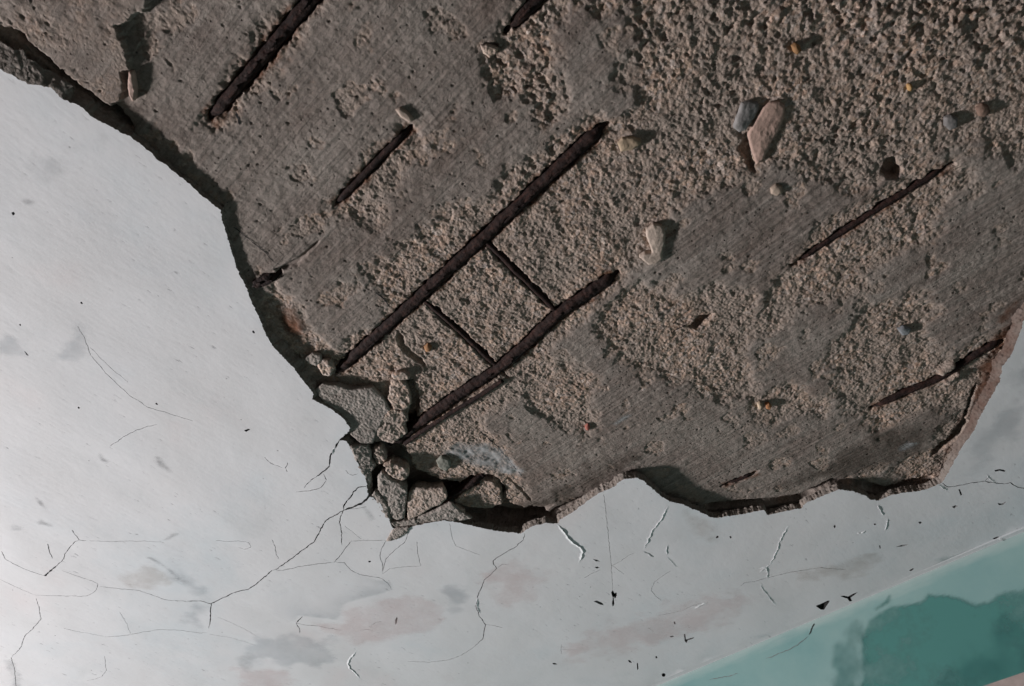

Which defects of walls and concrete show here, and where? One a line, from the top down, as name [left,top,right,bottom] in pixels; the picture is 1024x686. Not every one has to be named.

spalling [0,0,1024,534]
crack [78,327,189,443]
rust [974,310,1011,398]
crack [943,478,1024,489]
crack [1,441,421,684]
crack [410,526,525,662]